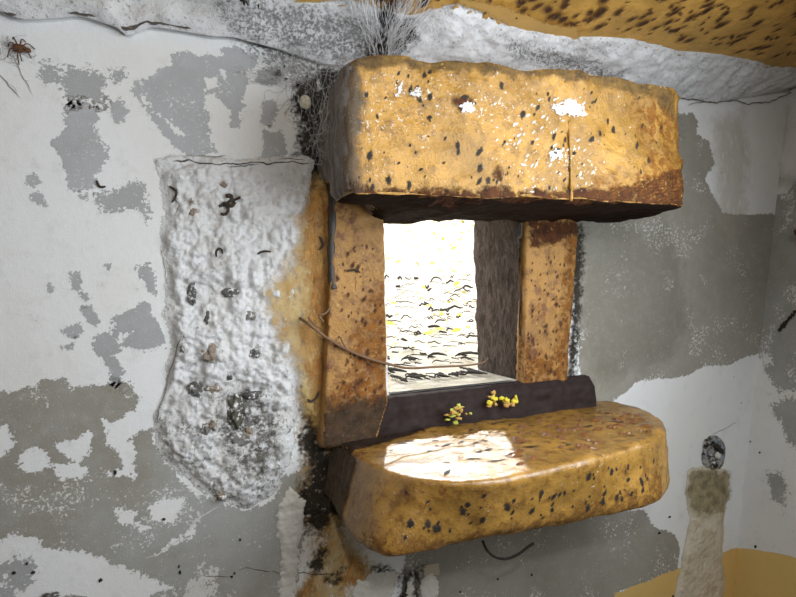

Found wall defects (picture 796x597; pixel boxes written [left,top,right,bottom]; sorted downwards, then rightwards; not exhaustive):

peeling [453,0,581,41]
rust [343,55,684,209]
peeling [495,99,587,193]
spalling [0,45,315,597]
peeling [573,112,796,450]
rust [266,180,662,597]
water stain [298,401,338,534]
spalling [701,435,726,470]
peeling [765,470,791,508]
water stain [307,544,343,585]
water stain [371,565,421,597]
peeling [399,509,680,597]